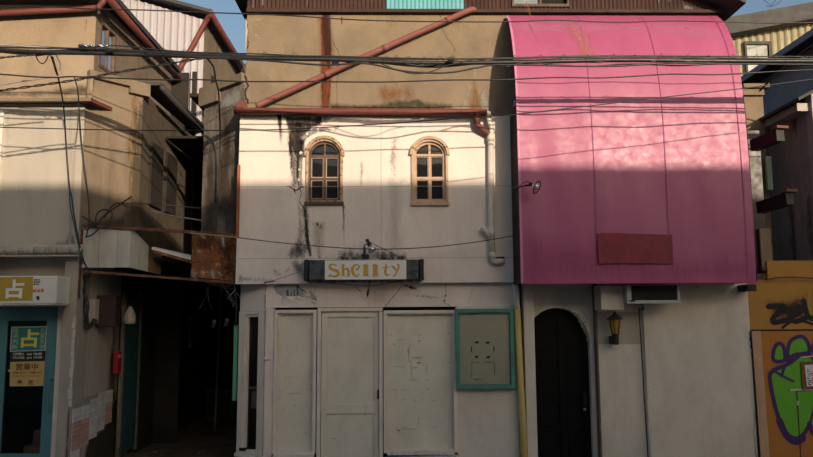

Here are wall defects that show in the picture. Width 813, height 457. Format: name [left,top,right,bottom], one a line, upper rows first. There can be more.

rust [193,235,237,278]
spalling [274,284,317,303]